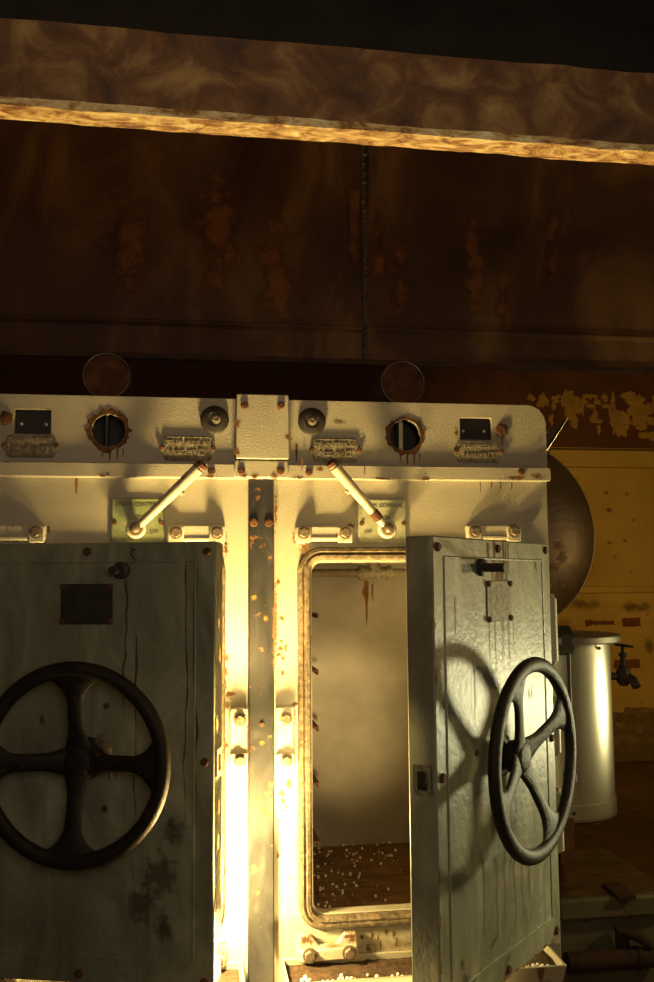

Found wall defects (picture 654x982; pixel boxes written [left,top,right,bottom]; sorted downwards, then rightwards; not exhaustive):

peeling [522,389,654,441]